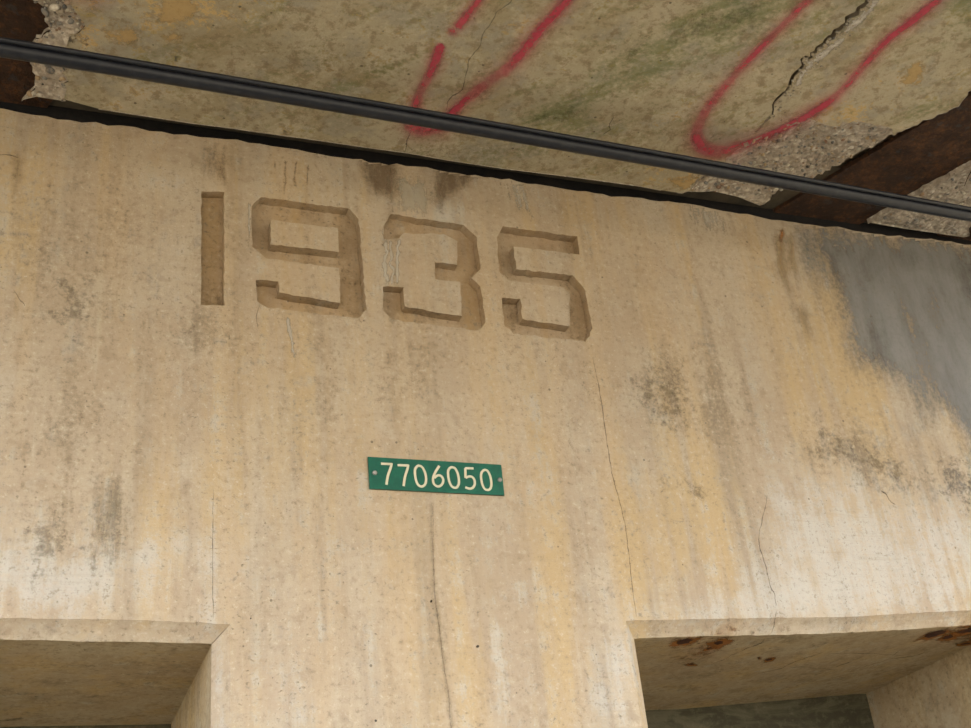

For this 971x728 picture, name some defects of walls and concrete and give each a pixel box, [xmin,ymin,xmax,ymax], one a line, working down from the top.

spalling [33,0,85,47]
spalling [22,62,68,102]
crack [756,0,879,132]
spalling [99,109,661,191]
spalling [725,90,971,178]
spalling [670,175,783,206]
spalling [908,160,971,207]
spalling [867,207,971,237]
corrosion [670,627,733,666]
corrosion [914,625,971,646]